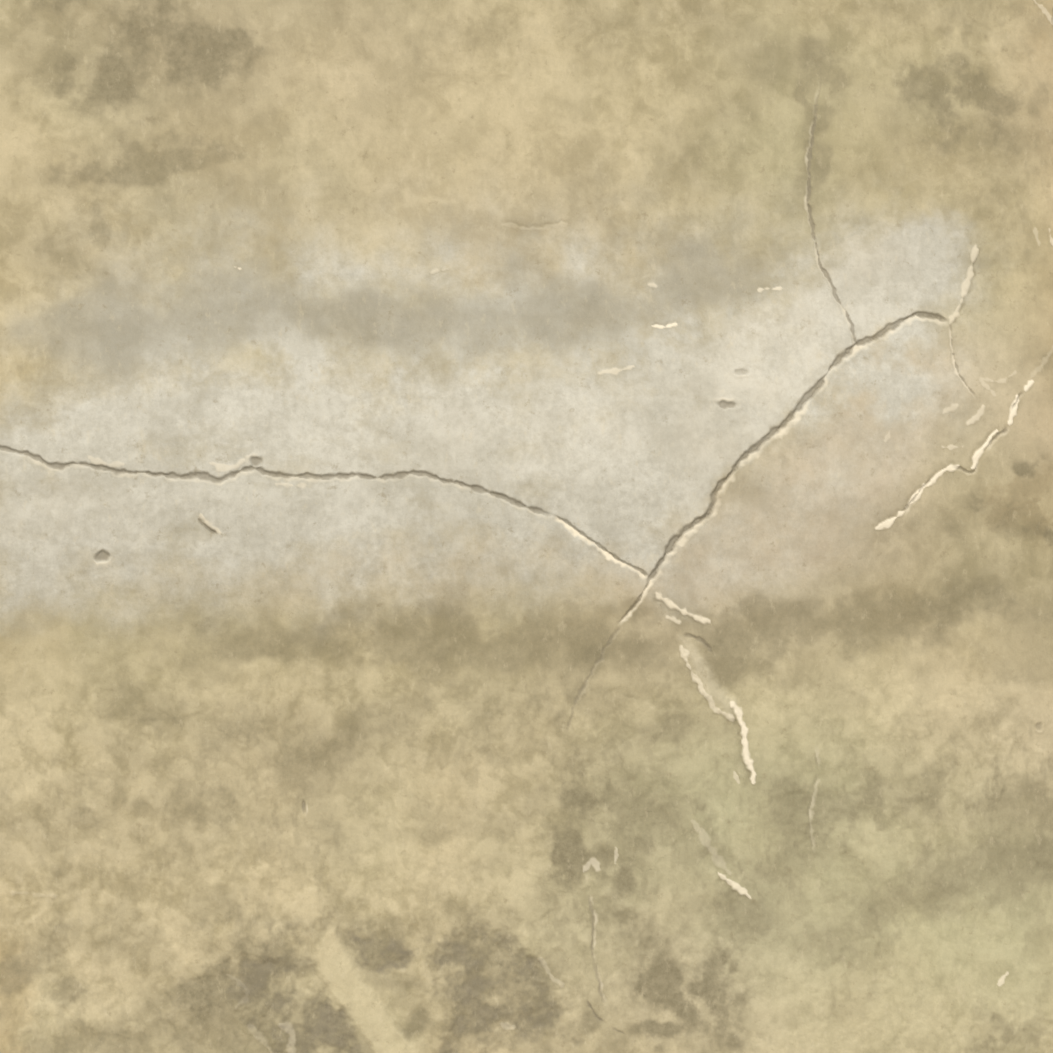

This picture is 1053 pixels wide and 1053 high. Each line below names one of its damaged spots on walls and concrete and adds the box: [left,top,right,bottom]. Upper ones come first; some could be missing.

crack [1033,0,1053,32]
crack [1032,227,1053,249]
crack [0,66,984,733]
crack [872,331,1053,530]
flaking render [674,632,757,788]